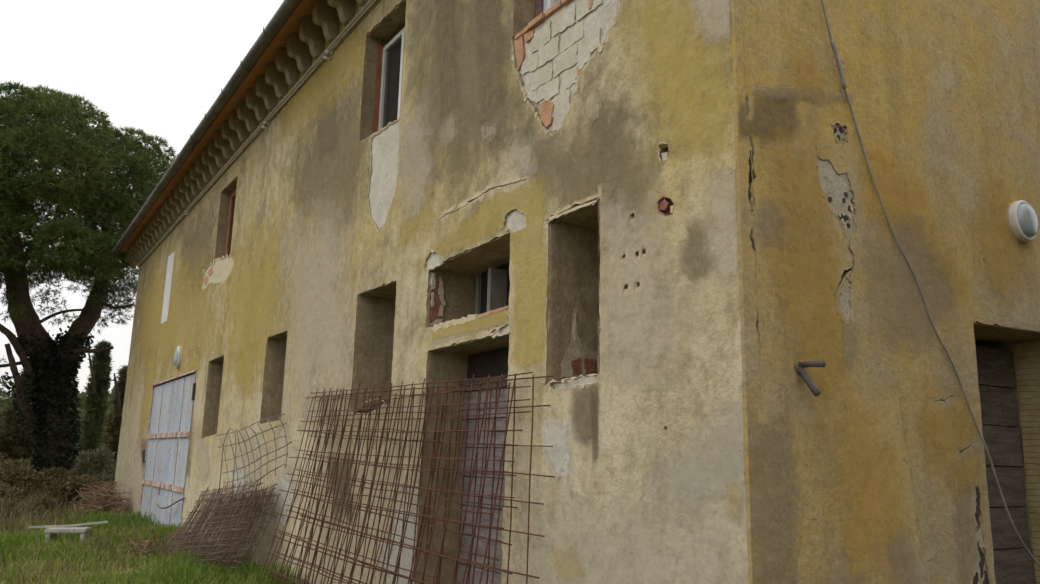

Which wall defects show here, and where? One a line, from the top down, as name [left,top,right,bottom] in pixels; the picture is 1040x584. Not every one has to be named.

spalling [510,0,621,151]
peeling [368,117,401,232]
spalling [500,209,525,234]
spalling [657,195,674,217]
crack [741,0,763,407]
spalling [816,153,857,238]
spalling [831,122,849,146]
spalling [200,255,234,291]
peeling [422,248,510,339]
spalling [548,307,600,392]
leakage [544,385,597,478]
peeling [968,485,992,584]